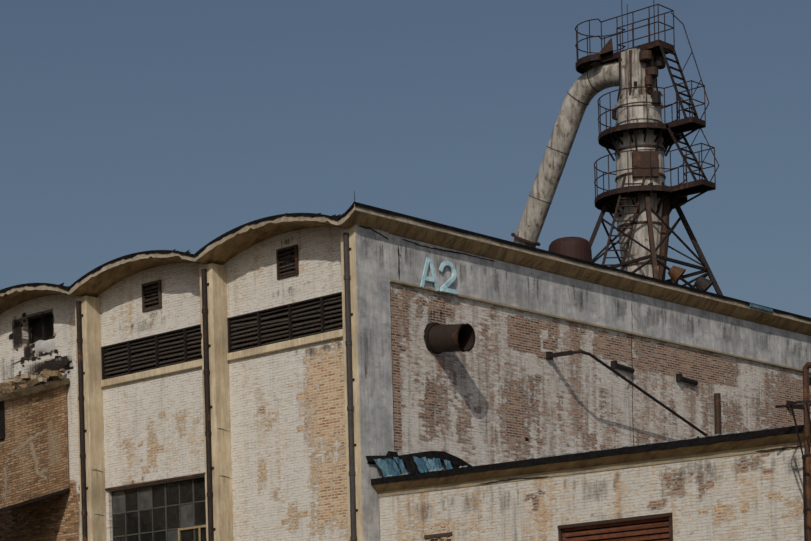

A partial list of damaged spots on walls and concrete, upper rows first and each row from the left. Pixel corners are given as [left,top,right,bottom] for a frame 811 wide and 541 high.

spalling [9,312,70,375]
peeling [281,338,348,538]
peeling [390,287,455,452]
peeling [415,369,482,449]
peeling [496,315,558,460]
peeling [573,329,739,429]
peeling [731,451,775,474]
peeling [760,372,811,429]
peeling [525,488,545,510]
peeling [647,469,749,525]
peeling [766,492,804,517]